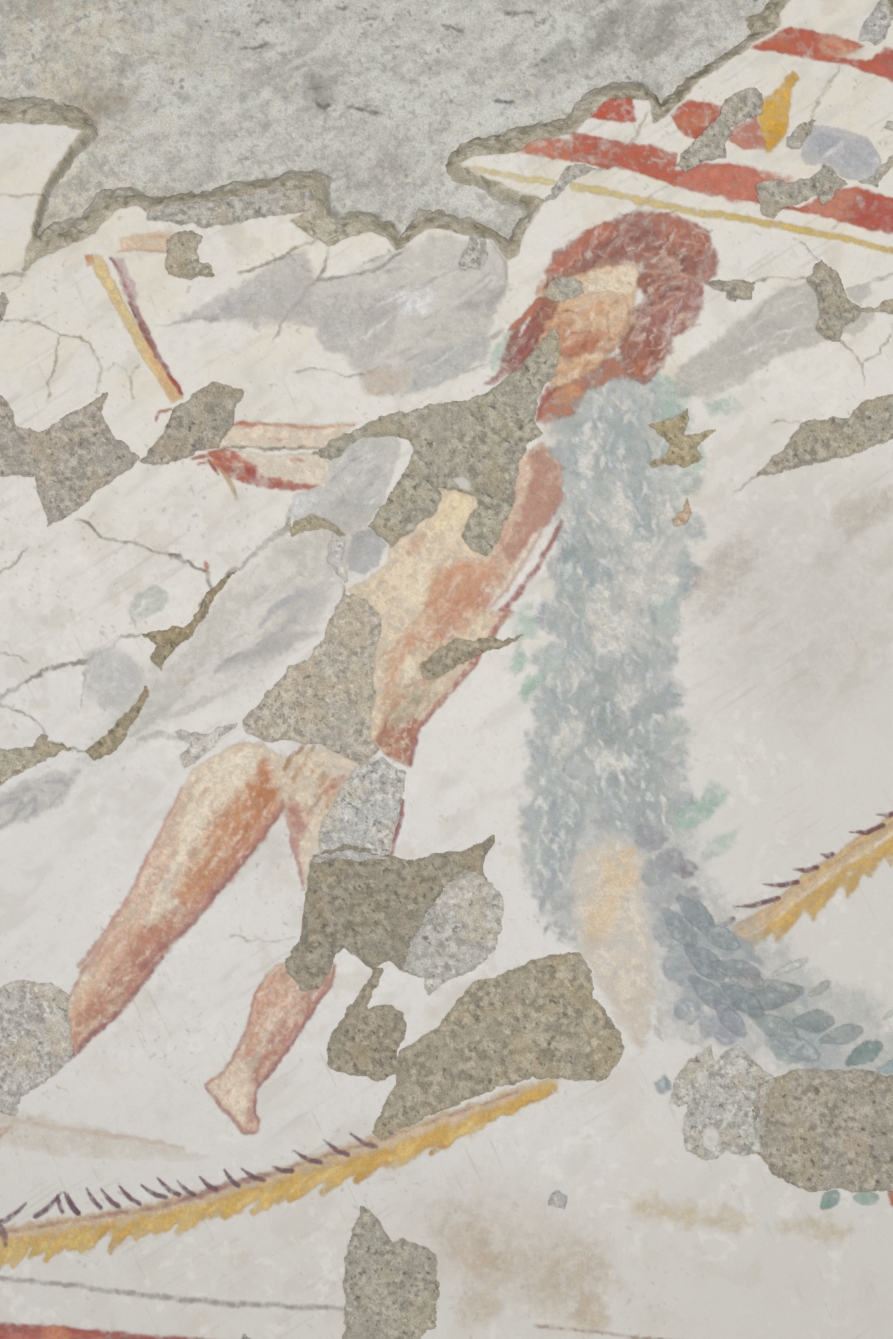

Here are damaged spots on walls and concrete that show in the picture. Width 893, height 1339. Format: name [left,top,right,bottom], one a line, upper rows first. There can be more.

spalling [0,0,790,280]
spalling [806,259,893,342]
spalling [0,382,244,527]
spalling [311,327,560,556]
spalling [757,394,893,477]
crack [169,517,290,608]
crack [15,660,87,711]
spalling [0,686,149,786]
spalling [174,514,625,1141]
spalling [0,980,73,1116]
spalling [669,1044,893,1193]
spalling [342,1206,440,1339]